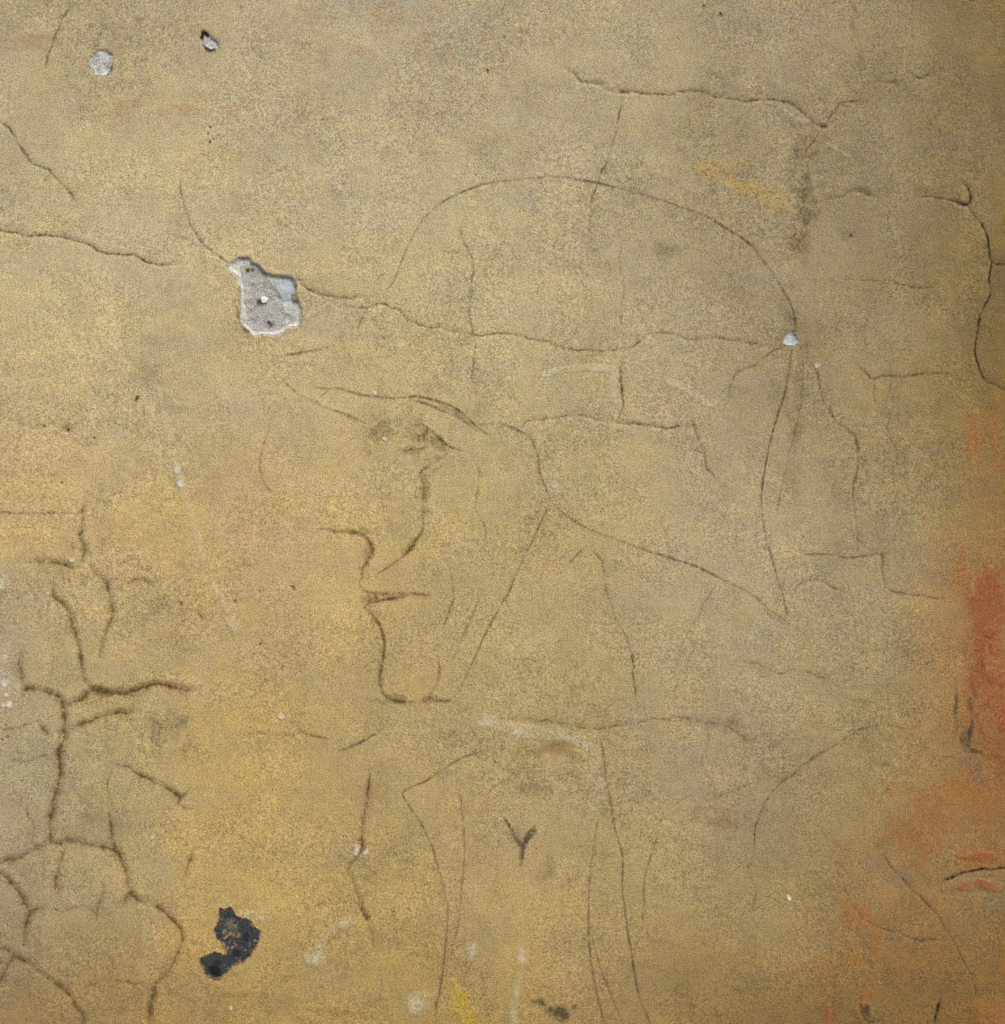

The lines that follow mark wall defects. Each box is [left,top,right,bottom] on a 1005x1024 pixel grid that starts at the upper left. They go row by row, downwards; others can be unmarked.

flaking render [88,50,113,76]
flaking render [199,30,219,51]
crack [618,90,859,148]
crack [0,229,163,265]
flaking render [228,257,303,336]
crack [925,184,1000,387]
flaking render [783,332,799,345]
crack [620,370,698,437]
crack [813,548,921,596]
crack [0,509,189,1015]
crack [55,982,85,1023]